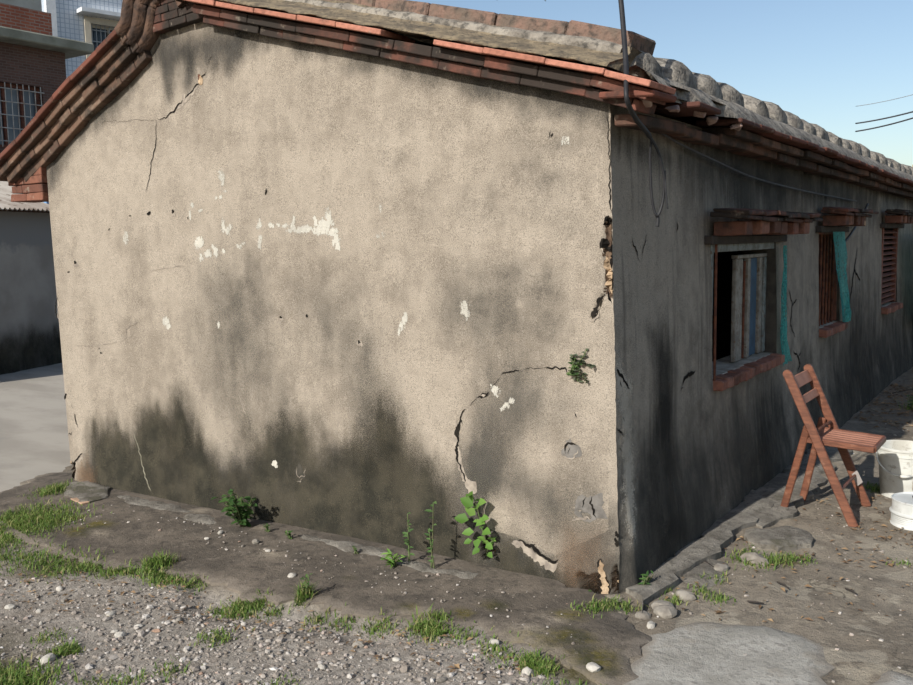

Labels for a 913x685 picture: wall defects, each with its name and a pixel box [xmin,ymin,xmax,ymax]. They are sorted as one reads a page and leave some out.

crack [108,55,213,192]
crack [605,118,613,210]
peeling [256,207,341,251]
spalling [591,215,613,322]
water stain [91,396,531,563]
crack [452,366,567,494]
water stain [492,377,539,429]
water stain [649,333,686,565]
water stain [497,541,575,588]
spalling [578,559,619,594]